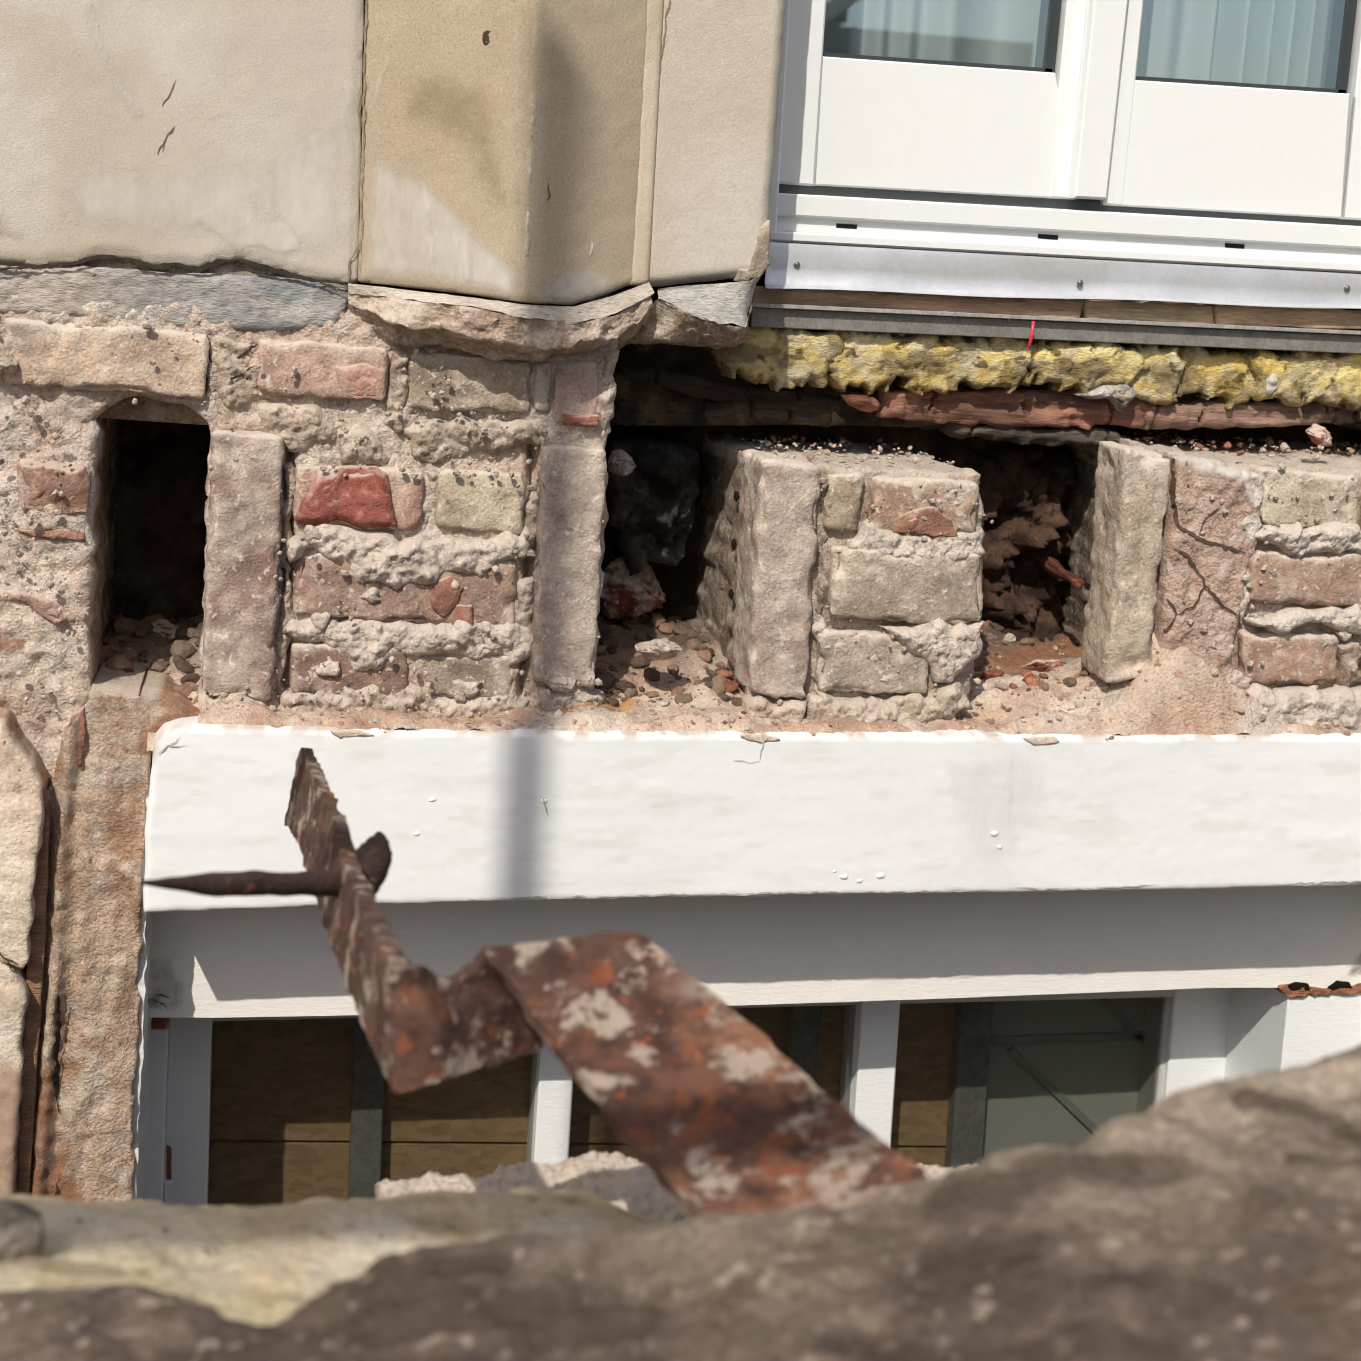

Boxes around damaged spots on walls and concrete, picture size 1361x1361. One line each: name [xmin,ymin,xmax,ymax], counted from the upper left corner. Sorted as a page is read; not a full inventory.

crack [658,0,671,93]
spalling [334,363,386,402]
spalling [17,459,91,541]
spalling [294,464,396,529]
crack [1163,458,1251,632]
spalling [0,589,66,624]
spalling [430,576,473,626]